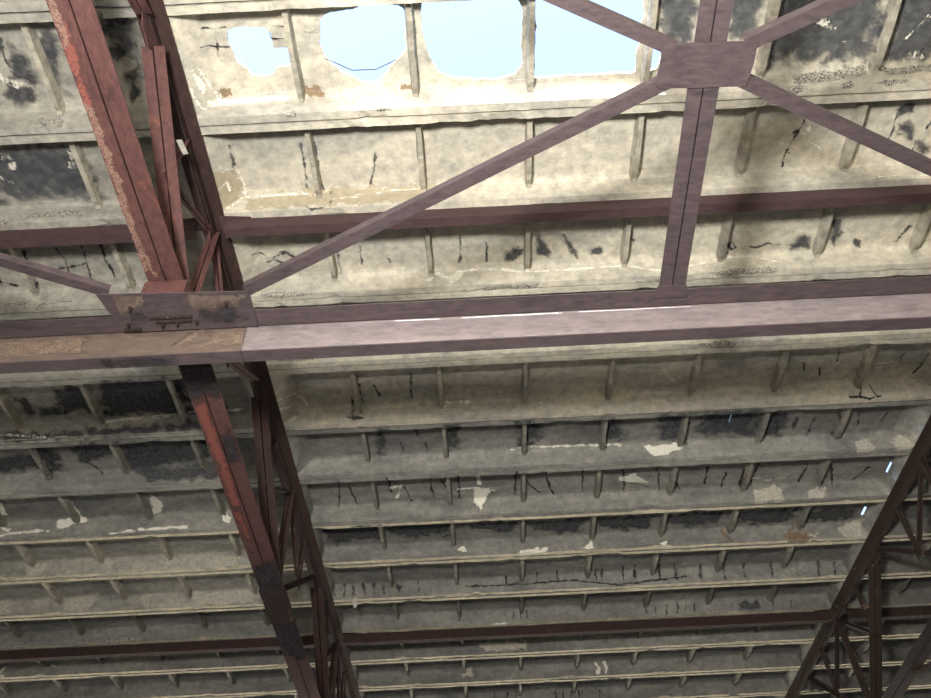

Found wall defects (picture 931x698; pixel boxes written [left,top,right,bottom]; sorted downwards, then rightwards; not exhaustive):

water stain [0,38,37,105]
water stain [40,29,59,85]
water stain [659,0,699,44]
water stain [729,0,761,38]
water stain [768,0,931,68]
crack [781,119,805,167]
water stain [0,144,98,202]
water stain [425,236,661,286]
water stain [0,376,218,483]
crack [386,476,460,501]
water stain [0,501,88,538]
crack [466,563,687,587]